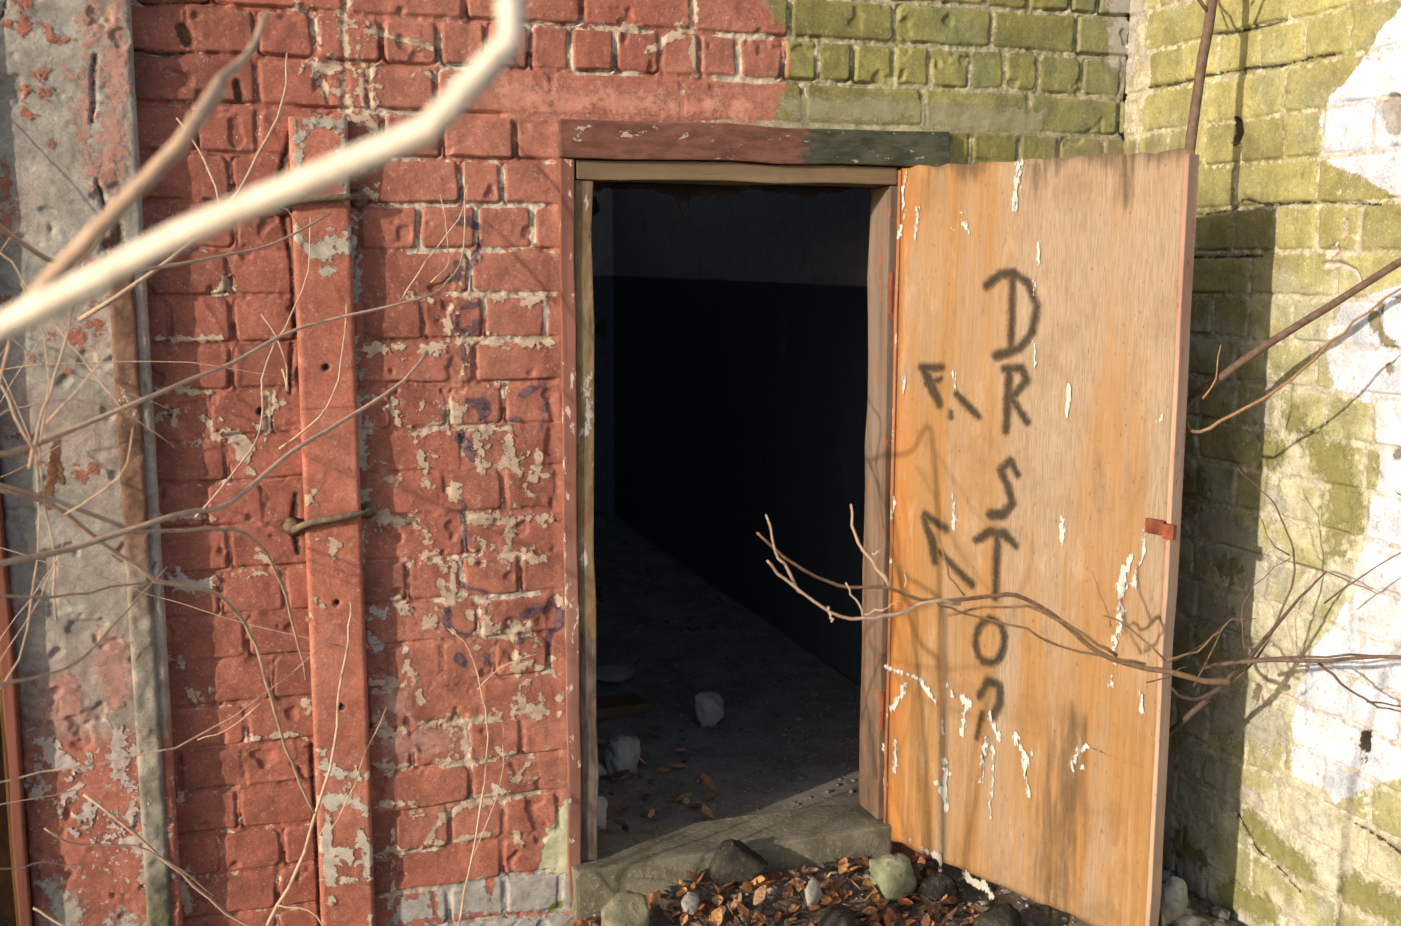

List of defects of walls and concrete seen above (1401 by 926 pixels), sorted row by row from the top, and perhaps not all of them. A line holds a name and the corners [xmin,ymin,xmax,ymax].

peeling [1,0,75,49]
spalling [175,22,196,48]
peeling [587,0,703,78]
spalling [233,78,246,104]
peeling [289,0,435,171]
flaking render [99,223,125,257]
peeling [294,168,390,305]
peeling [154,333,224,344]
peeling [153,384,287,476]
peeling [163,546,278,596]
peeling [315,254,565,914]
peeling [242,696,312,743]